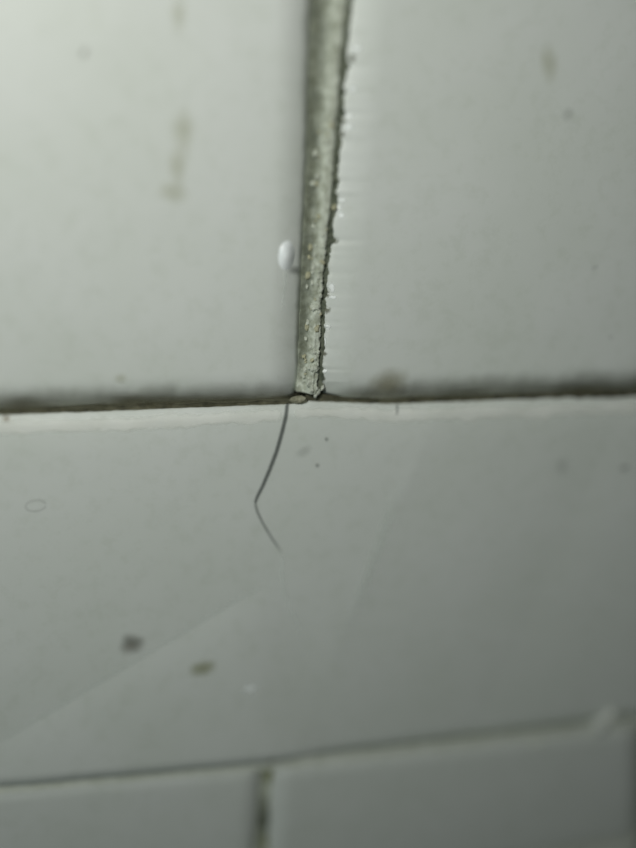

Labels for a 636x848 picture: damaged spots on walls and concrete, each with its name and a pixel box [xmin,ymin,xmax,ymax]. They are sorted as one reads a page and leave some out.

crack [255,403,288,503]